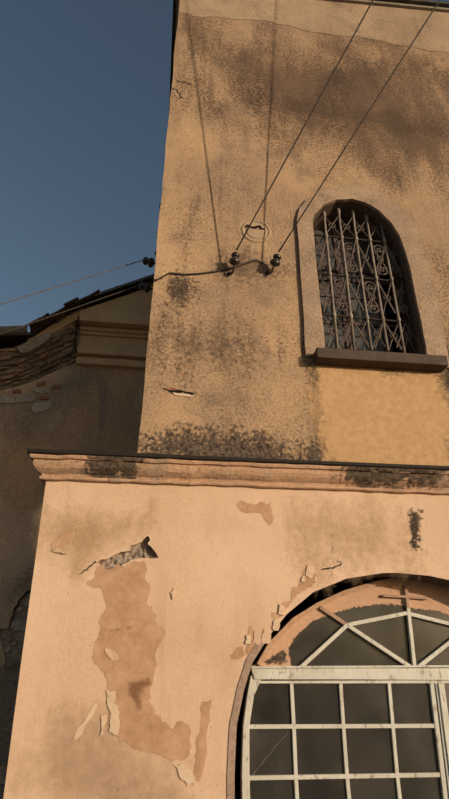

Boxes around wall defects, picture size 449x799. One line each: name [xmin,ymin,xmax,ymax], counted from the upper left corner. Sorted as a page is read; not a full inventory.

damp [181,18,449,196]
spalling [163,387,196,397]
peeling [237,501,273,524]
damp [408,508,424,551]
flaking render [0,588,31,672]
peeling [79,535,211,785]
peeling [231,565,318,659]